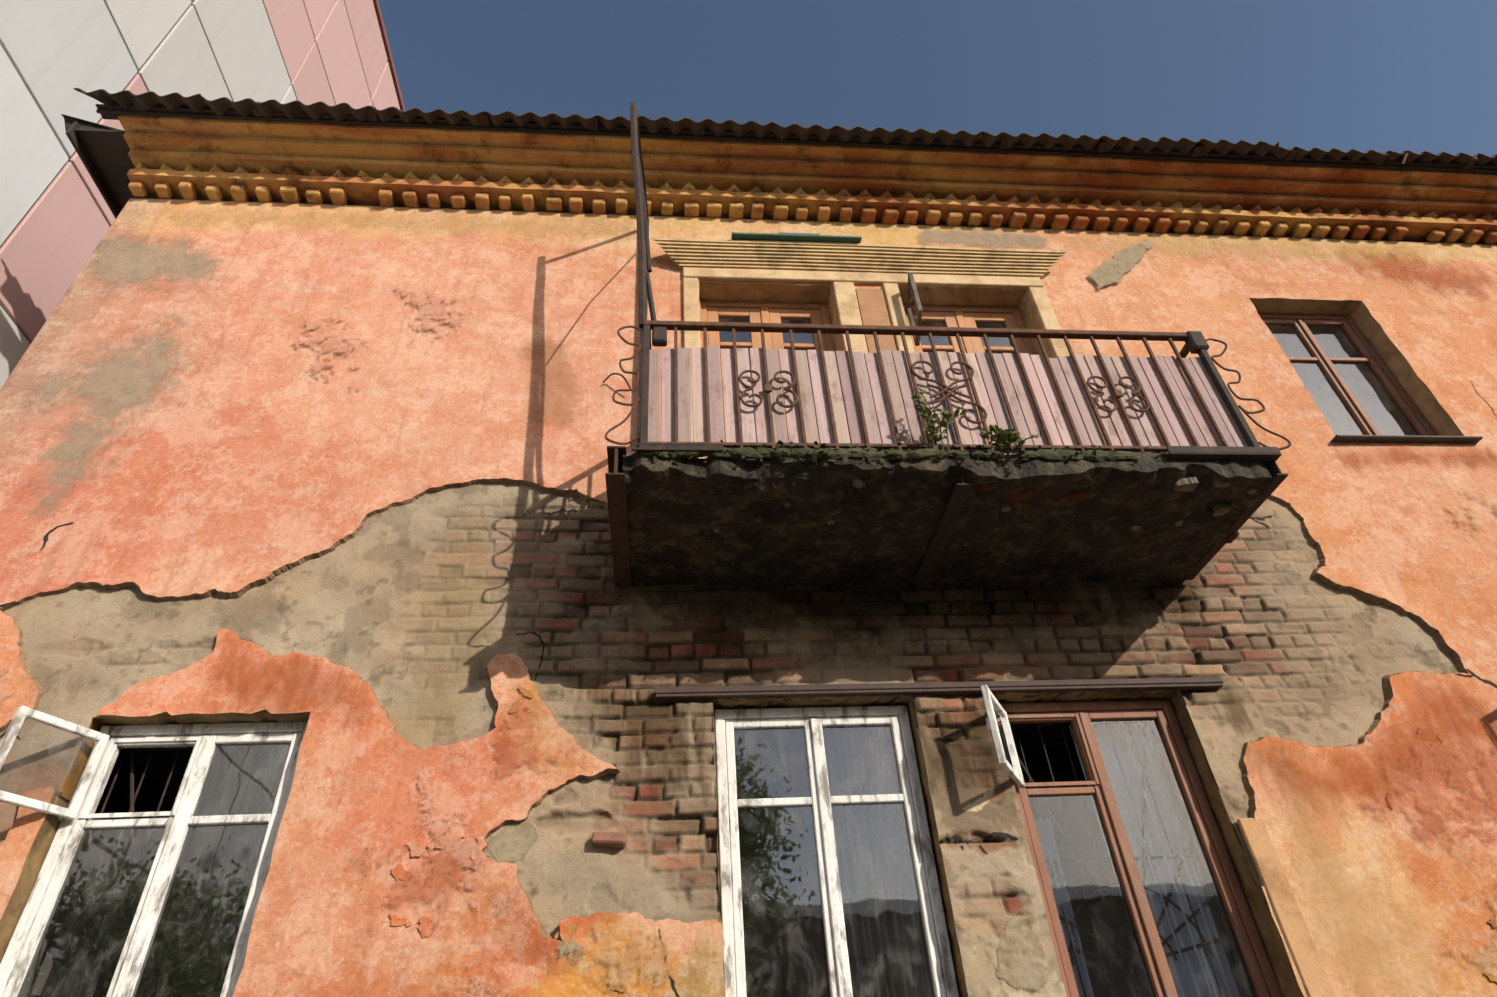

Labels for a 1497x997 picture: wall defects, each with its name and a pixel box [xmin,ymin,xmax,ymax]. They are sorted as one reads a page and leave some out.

damp [90,238,214,284]
crack [40,522,73,551]
spalling [0,477,1469,997]
peeling [1446,886,1497,983]